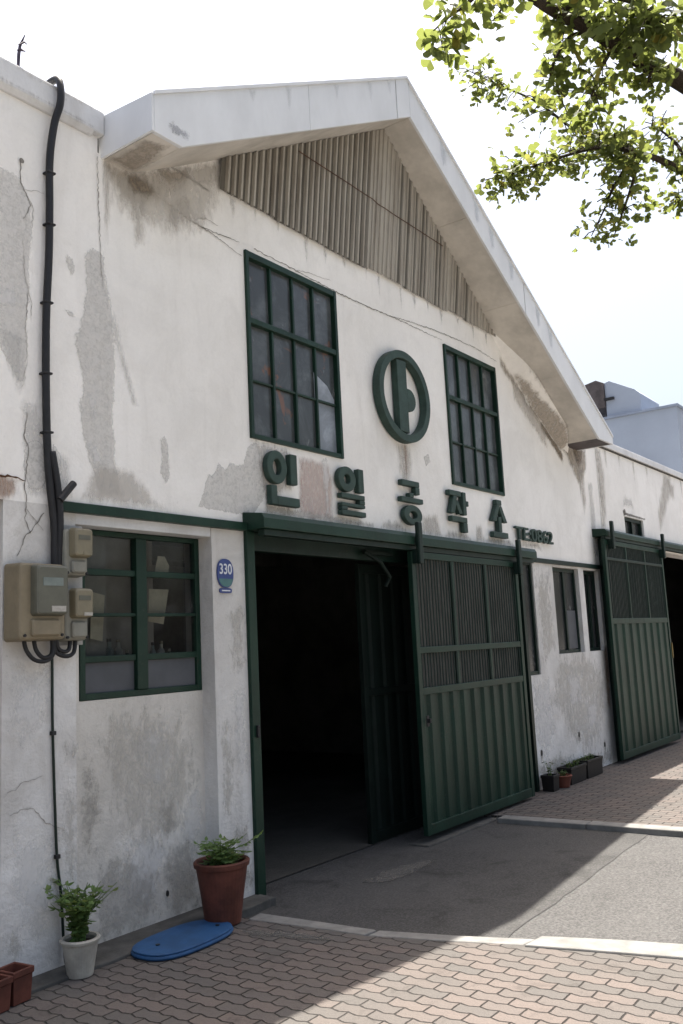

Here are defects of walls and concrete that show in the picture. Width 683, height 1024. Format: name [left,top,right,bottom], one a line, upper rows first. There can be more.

leakage [108,142,215,233]
peeling [0,168,32,380]
crack [158,195,494,360]
crack [17,413,44,556]
peeling [67,249,150,503]
peeling [161,437,169,481]
peeling [200,443,287,514]
leakage [501,362,605,518]
crack [10,776,63,829]